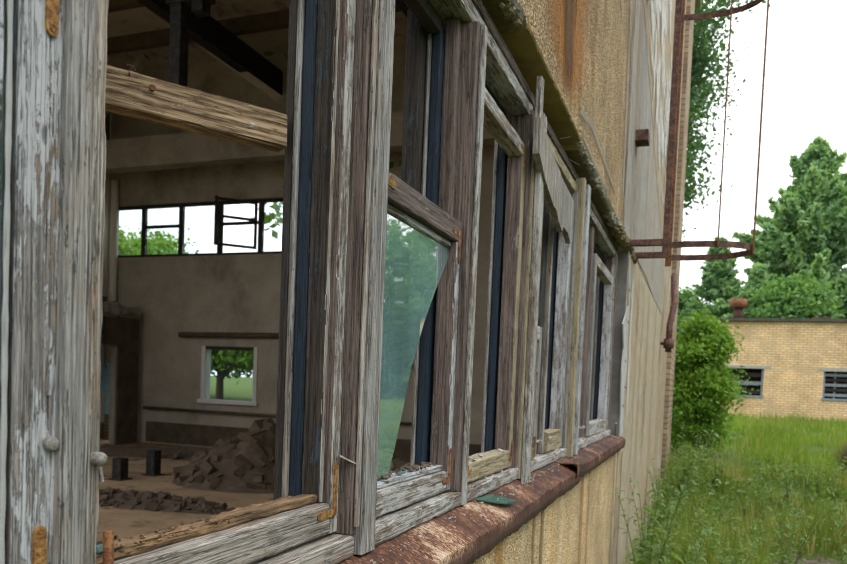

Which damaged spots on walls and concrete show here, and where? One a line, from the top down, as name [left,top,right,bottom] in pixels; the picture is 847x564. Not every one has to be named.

corrosion [549,0,586,94]